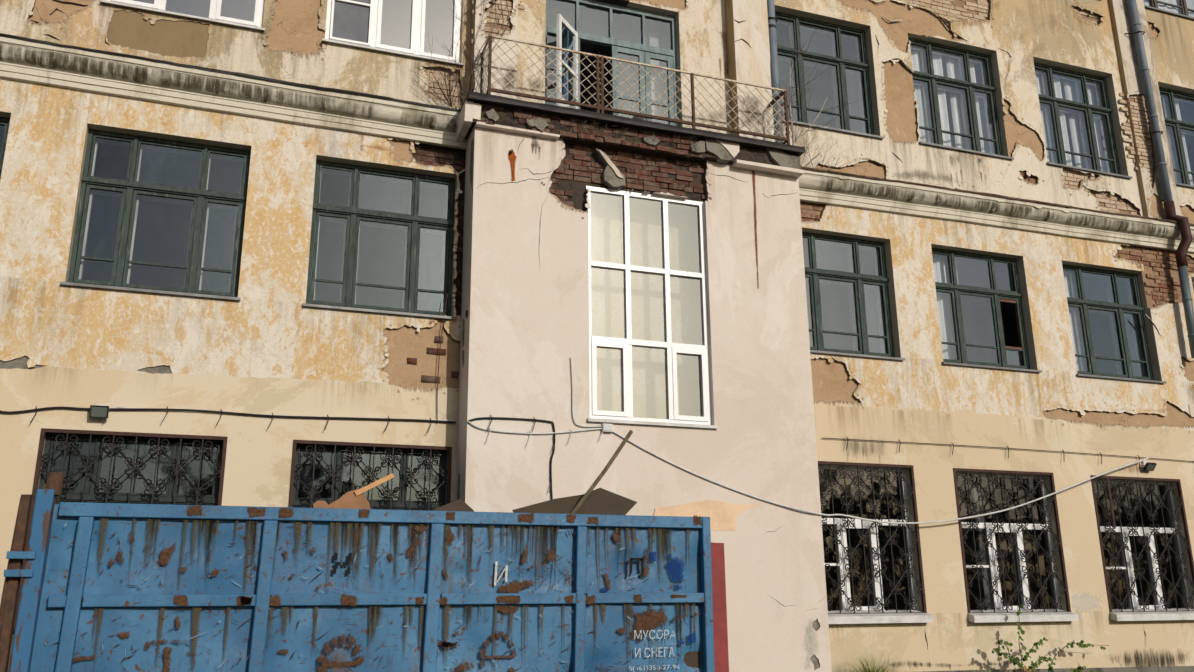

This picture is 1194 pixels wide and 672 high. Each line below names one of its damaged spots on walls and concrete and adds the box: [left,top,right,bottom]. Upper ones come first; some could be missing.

peeling [262,0,327,62]
flaking render [471,0,525,45]
damp [0,46,270,103]
peeling [838,0,994,147]
damp [414,115,456,132]
corrosion [508,150,516,181]
peeling [1002,97,1046,187]
flaking render [1060,92,1166,219]
spalling [370,62,712,401]
flaking render [1108,243,1194,315]
flaking render [811,355,864,409]
peeling [1043,398,1194,433]